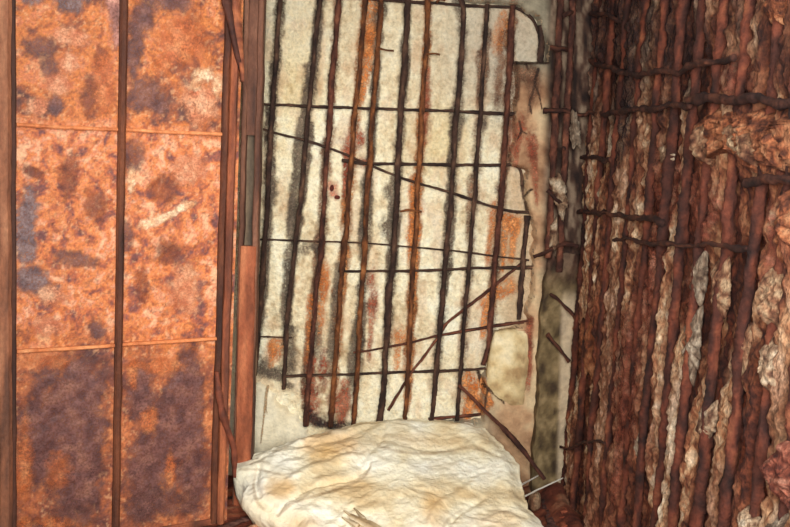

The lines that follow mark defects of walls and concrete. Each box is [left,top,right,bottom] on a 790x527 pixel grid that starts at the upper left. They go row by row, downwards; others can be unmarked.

water stain [307,11,322,80]
corrosion [180,83,217,127]
spalling [232,82,242,373]
water stain [257,116,318,389]
corrosion [268,0,433,430]
water stain [358,174,372,246]
water stain [382,176,395,241]
corrosion [476,0,540,338]
spalling [256,0,790,527]
corrosion [462,371,493,419]
corrosion [526,318,534,387]
corrosion [16,432,73,527]